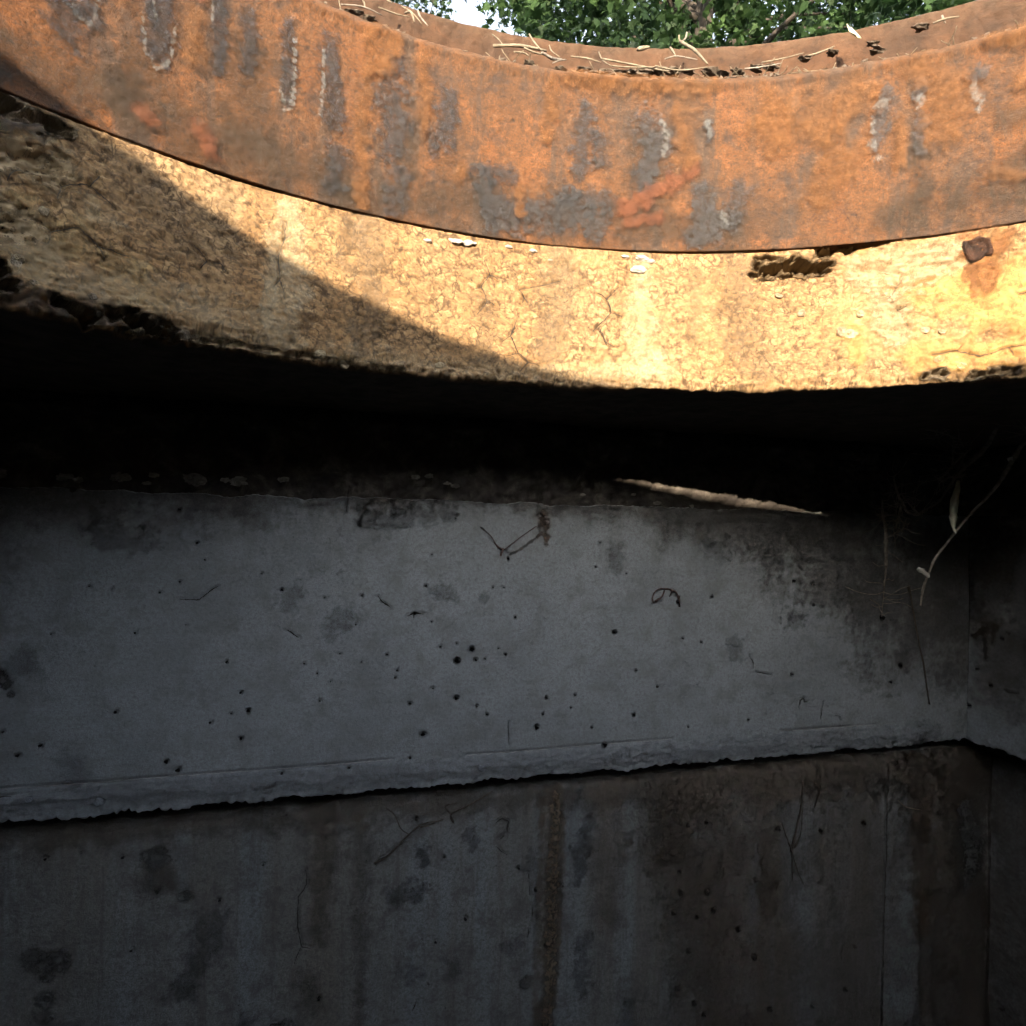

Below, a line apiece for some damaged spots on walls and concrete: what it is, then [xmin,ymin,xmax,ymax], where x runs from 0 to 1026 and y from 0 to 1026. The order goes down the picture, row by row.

rust [568,69,718,110]
peeling [0,90,80,190]
rust [619,156,699,226]
peeling [0,190,51,293]
spalling [49,292,406,372]
crack [474,260,560,371]
crack [593,287,622,347]
peeling [747,240,967,346]
rust [898,227,1026,371]